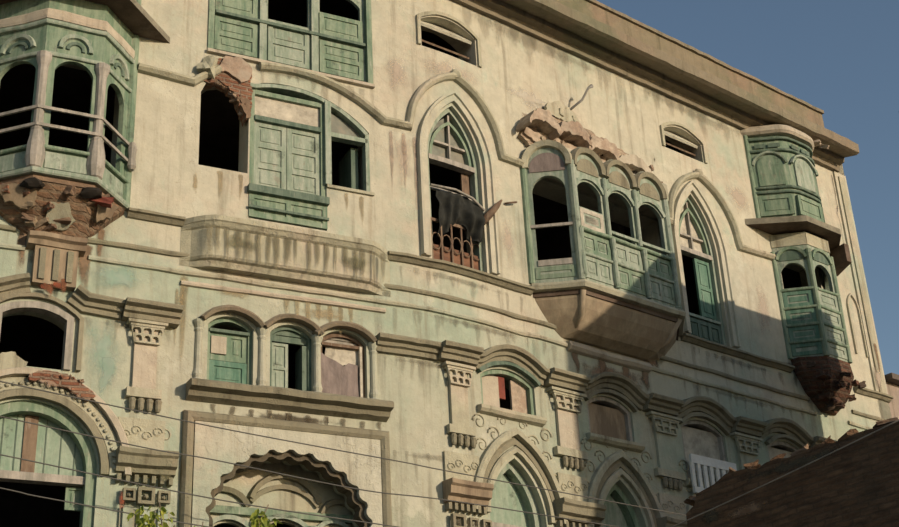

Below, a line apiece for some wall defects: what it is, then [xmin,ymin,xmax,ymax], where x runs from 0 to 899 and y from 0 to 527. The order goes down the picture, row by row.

peeling [197,55,243,120]
flaking render [516,101,655,174]
water stain [207,225,385,281]
flaking render [28,370,96,402]